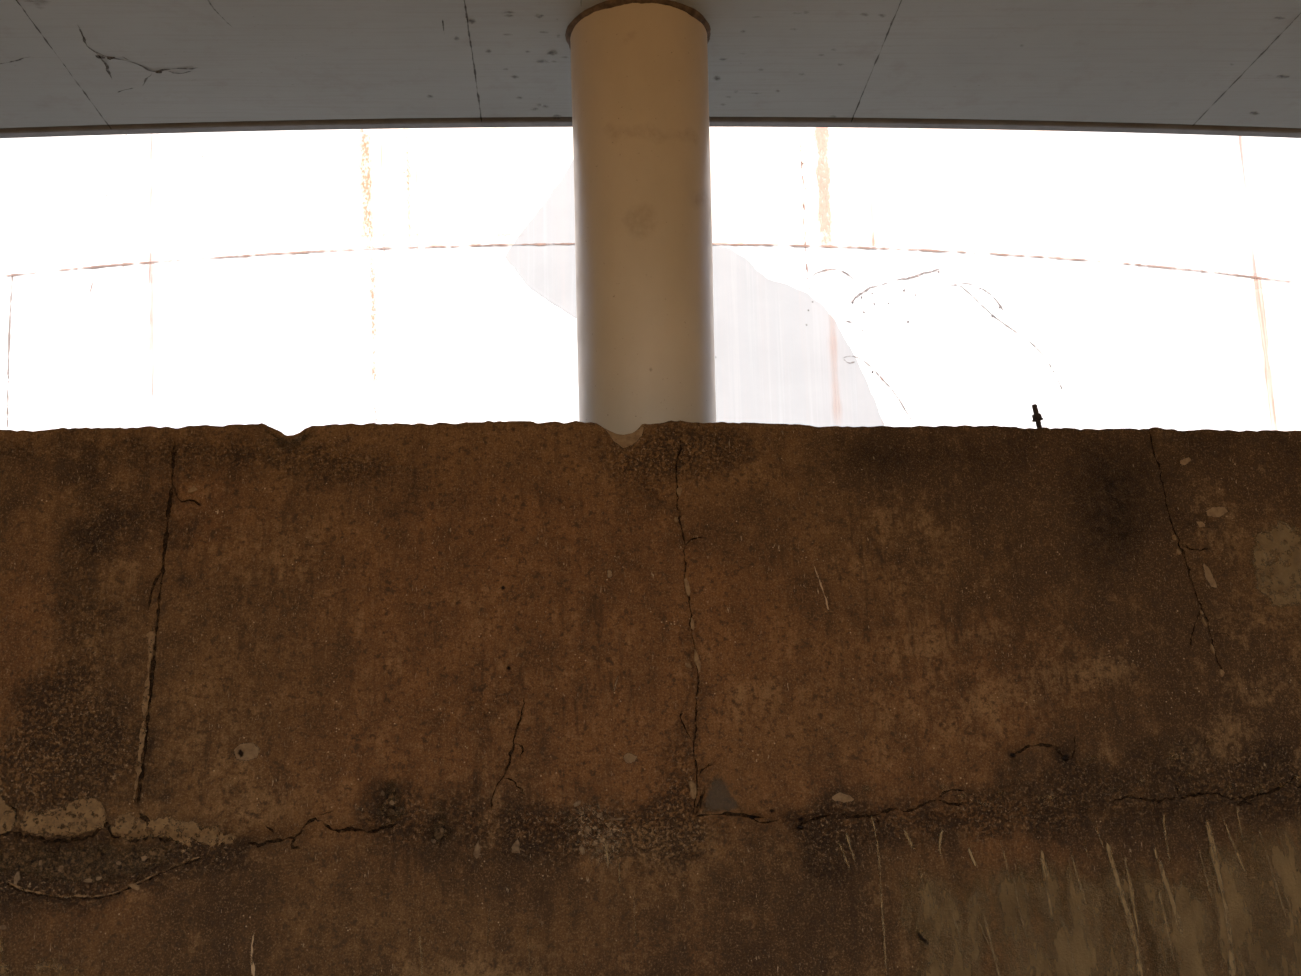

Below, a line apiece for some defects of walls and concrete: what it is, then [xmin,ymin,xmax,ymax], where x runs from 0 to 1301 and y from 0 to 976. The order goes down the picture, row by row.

crack [79,29,194,92]
corrosion [360,129,372,236]
corrosion [799,127,832,282]
crack [1149,432,1229,677]
crack [0,445,201,900]
crack [674,439,967,825]
peeling [0,794,236,852]
crack [248,811,395,849]
crack [491,698,525,808]
crack [1014,738,1075,758]
crack [1113,776,1301,806]
damp [901,808,1301,976]